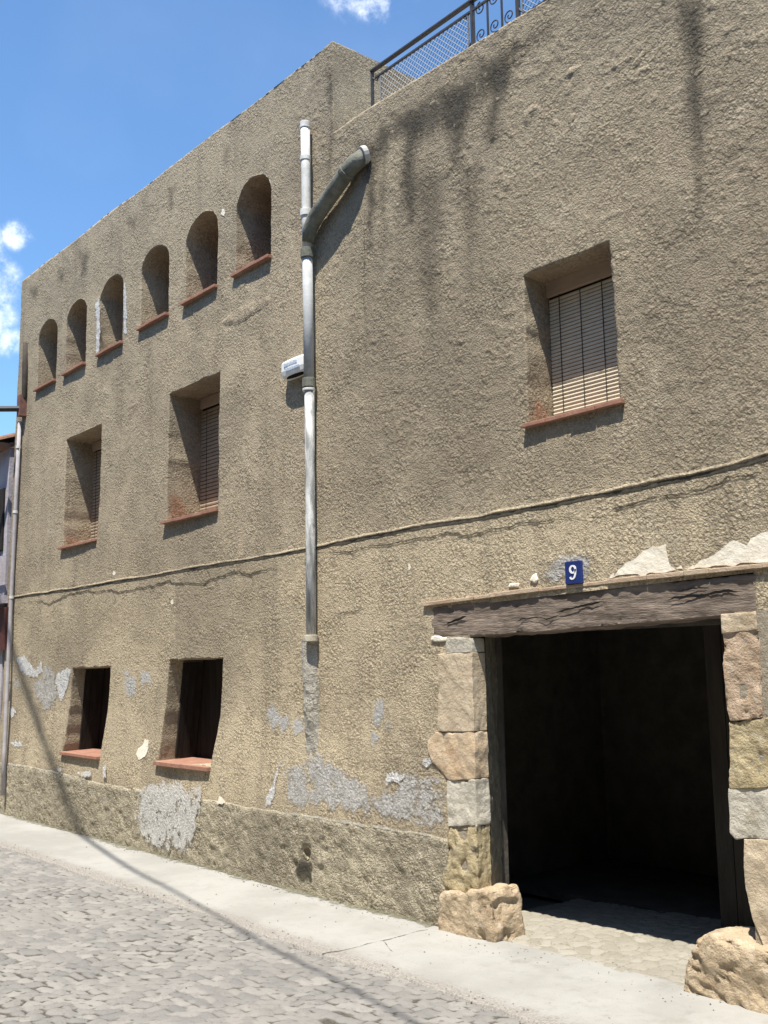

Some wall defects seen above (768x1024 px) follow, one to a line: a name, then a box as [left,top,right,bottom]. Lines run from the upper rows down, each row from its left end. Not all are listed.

crack [614,471,762,510]
crack [327,515,575,557]
spalling [609,532,768,578]
crack [34,568,278,605]
peeling [13,655,43,690]
peeling [55,668,71,701]
peeling [385,772,404,785]
peeling [421,757,440,791]